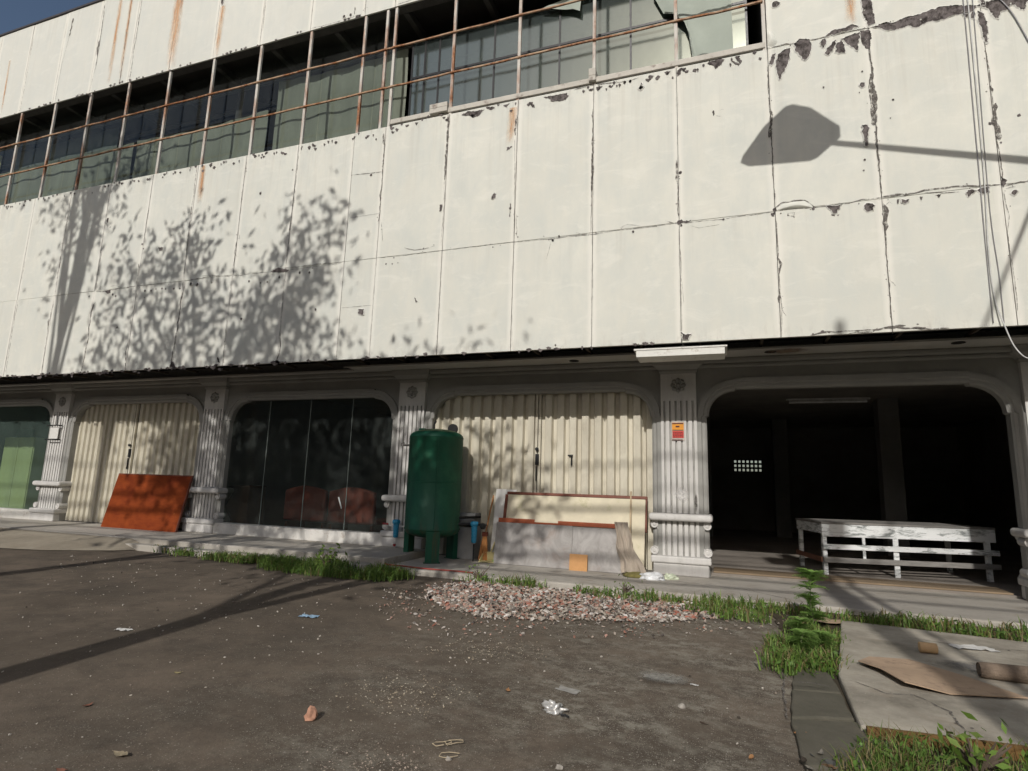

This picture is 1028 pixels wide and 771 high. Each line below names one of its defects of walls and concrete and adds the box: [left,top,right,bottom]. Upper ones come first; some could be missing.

peeling [753,0,1028,81]
peeling [462,56,742,117]
spalling [861,124,870,171]